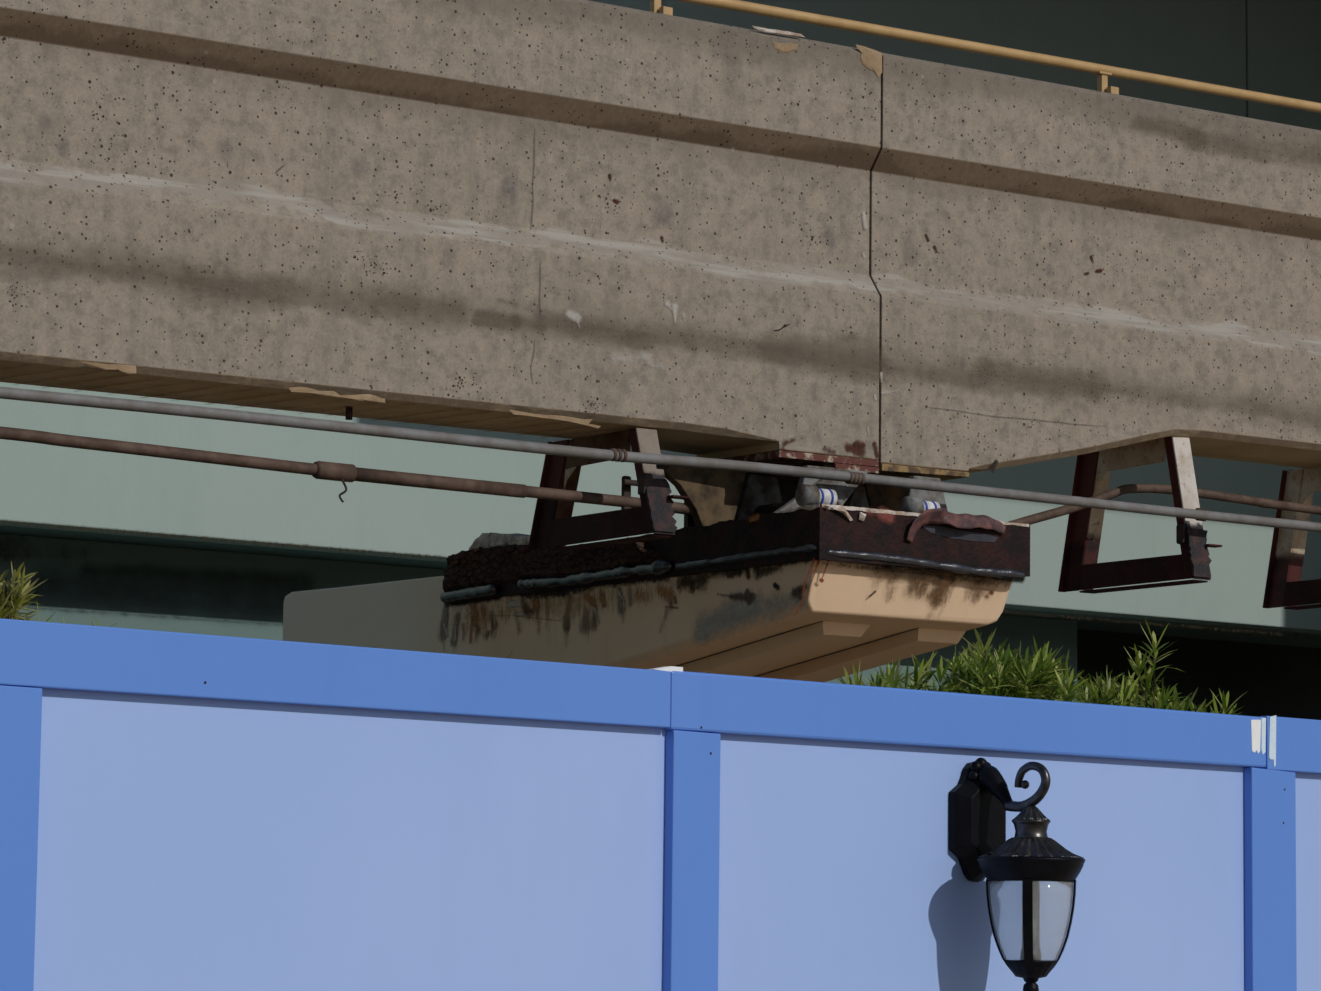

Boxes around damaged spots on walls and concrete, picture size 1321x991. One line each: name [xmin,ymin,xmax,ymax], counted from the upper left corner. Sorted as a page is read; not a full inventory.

rust [439,537,678,647]
leakage [521,561,807,605]
leakage [825,563,1010,587]
rust [914,572,998,606]